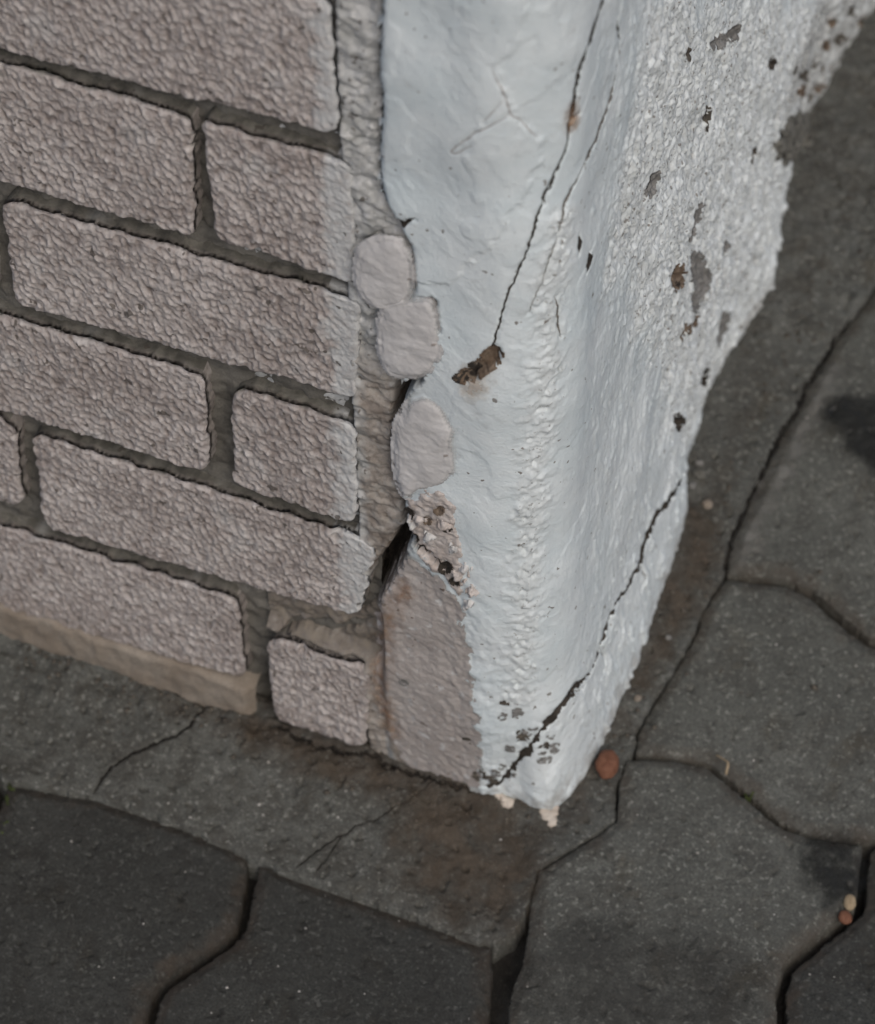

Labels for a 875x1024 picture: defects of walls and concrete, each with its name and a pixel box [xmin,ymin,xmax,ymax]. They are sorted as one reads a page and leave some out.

spalling [710,24,742,51]
crack [450,68,538,154]
spalling [702,106,712,132]
spalling [771,4,866,168]
crack [492,0,620,345]
spalling [644,170,662,199]
spalling [671,202,713,341]
spalling [452,344,505,385]
spalling [673,412,686,432]
peeling [267,490,517,788]
crack [273,479,682,875]
peeling [498,701,560,764]